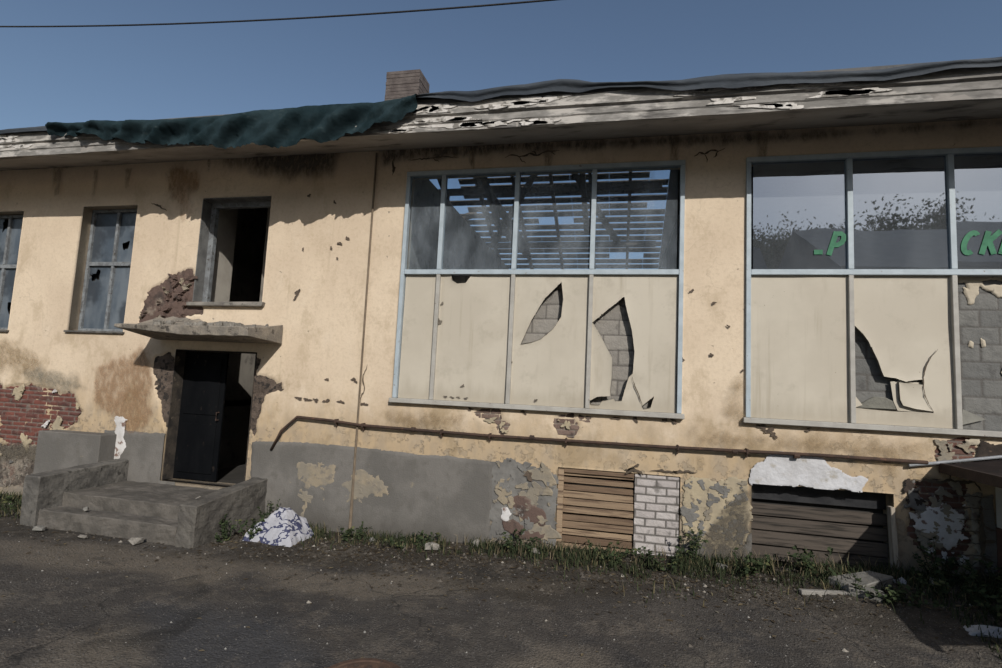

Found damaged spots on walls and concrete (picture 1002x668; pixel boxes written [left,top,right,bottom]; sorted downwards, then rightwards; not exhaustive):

peeling [377,94,573,134]
peeling [672,82,893,110]
peeling [0,134,33,149]
peeling [139,274,198,319]
spalling [855,326,934,413]
flaking render [0,383,82,488]
flaking render [553,404,593,438]
flaking render [934,437,980,466]
flaking render [493,460,562,543]
flaking render [903,478,971,573]